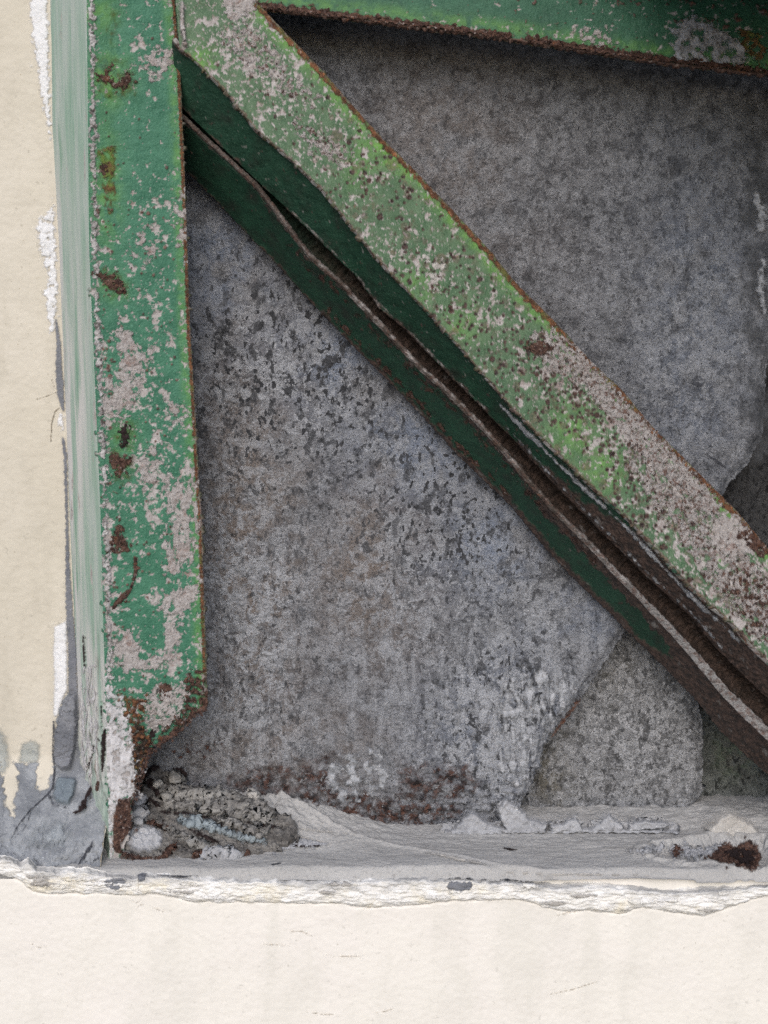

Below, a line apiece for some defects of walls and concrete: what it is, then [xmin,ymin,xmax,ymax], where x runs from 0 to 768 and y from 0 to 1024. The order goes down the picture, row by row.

corrosion [94,63,137,95]
peeling [87,0,162,459]
corrosion [254,0,768,558]
corrosion [109,424,132,478]
corrosion [106,518,140,609]
corrosion [113,69,223,861]
peeling [137,440,201,576]
peeling [163,397,194,425]
peeling [529,326,768,646]
flaking render [0,465,768,916]
corrosion [398,766,481,802]
corrosion [704,837,762,872]